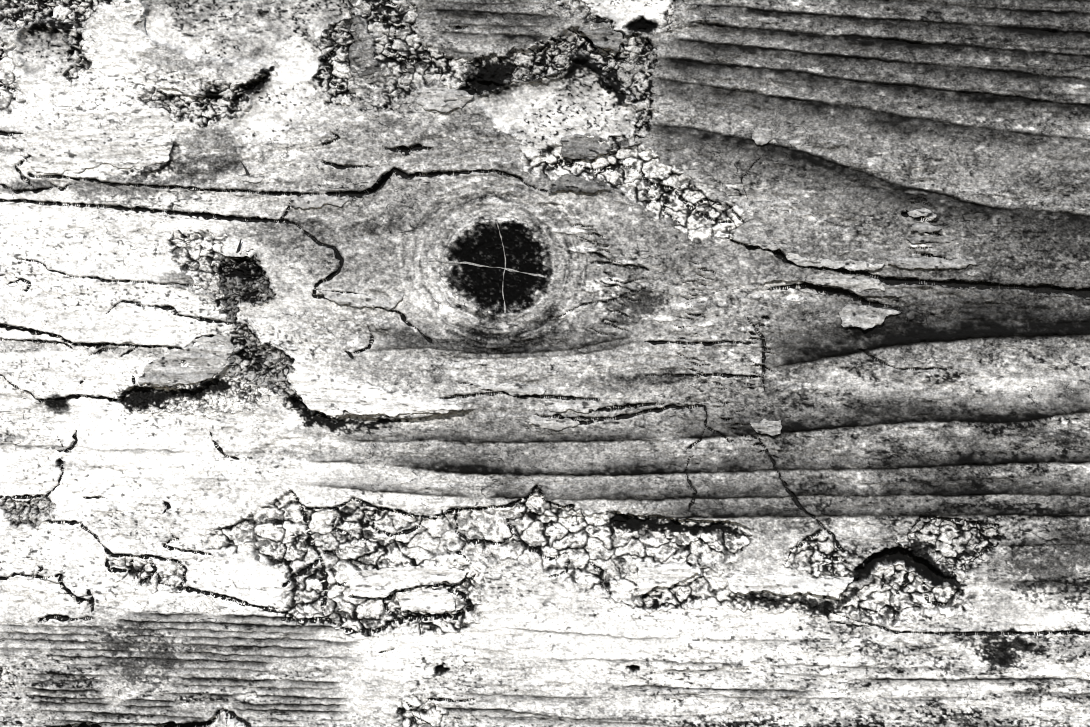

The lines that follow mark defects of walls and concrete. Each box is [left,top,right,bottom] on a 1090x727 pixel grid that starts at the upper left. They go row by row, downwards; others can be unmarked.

spalling [0,0,747,242]
crack [0,128,548,359]
spalling [111,230,463,420]
crack [440,197,1090,554]
spalling [199,485,1003,638]
crack [38,719,102,727]
crack [163,708,251,727]